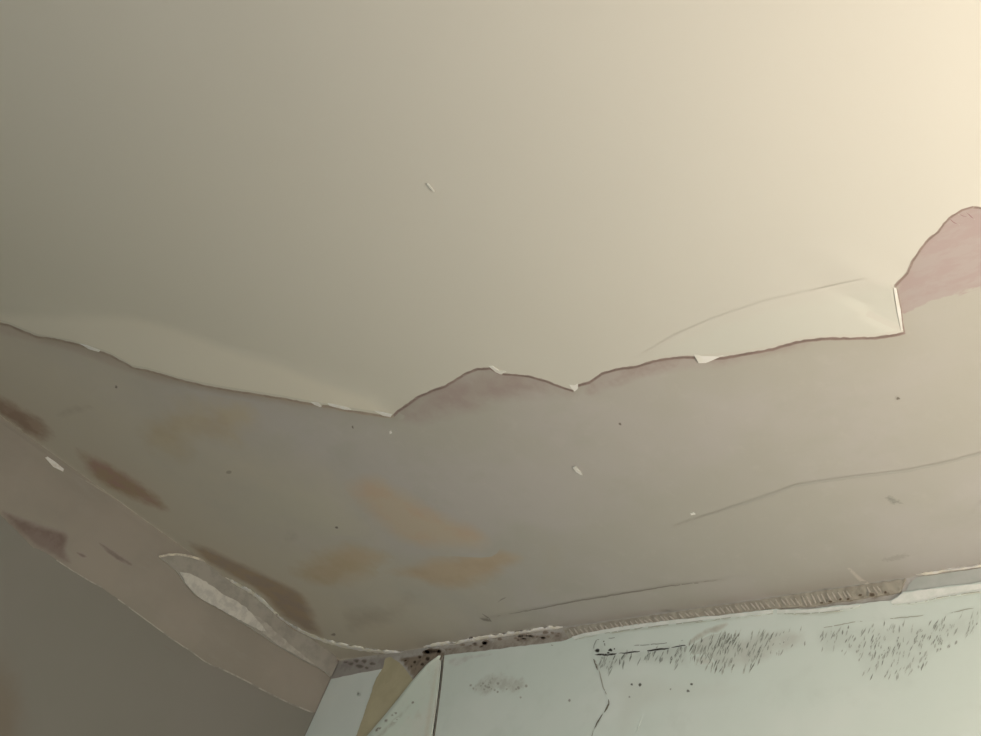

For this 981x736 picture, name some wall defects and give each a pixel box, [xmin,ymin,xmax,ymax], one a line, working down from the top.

damp [0,208,981,430]
peeling [0,206,981,736]
crack [672,452,981,527]
damp [592,604,981,736]